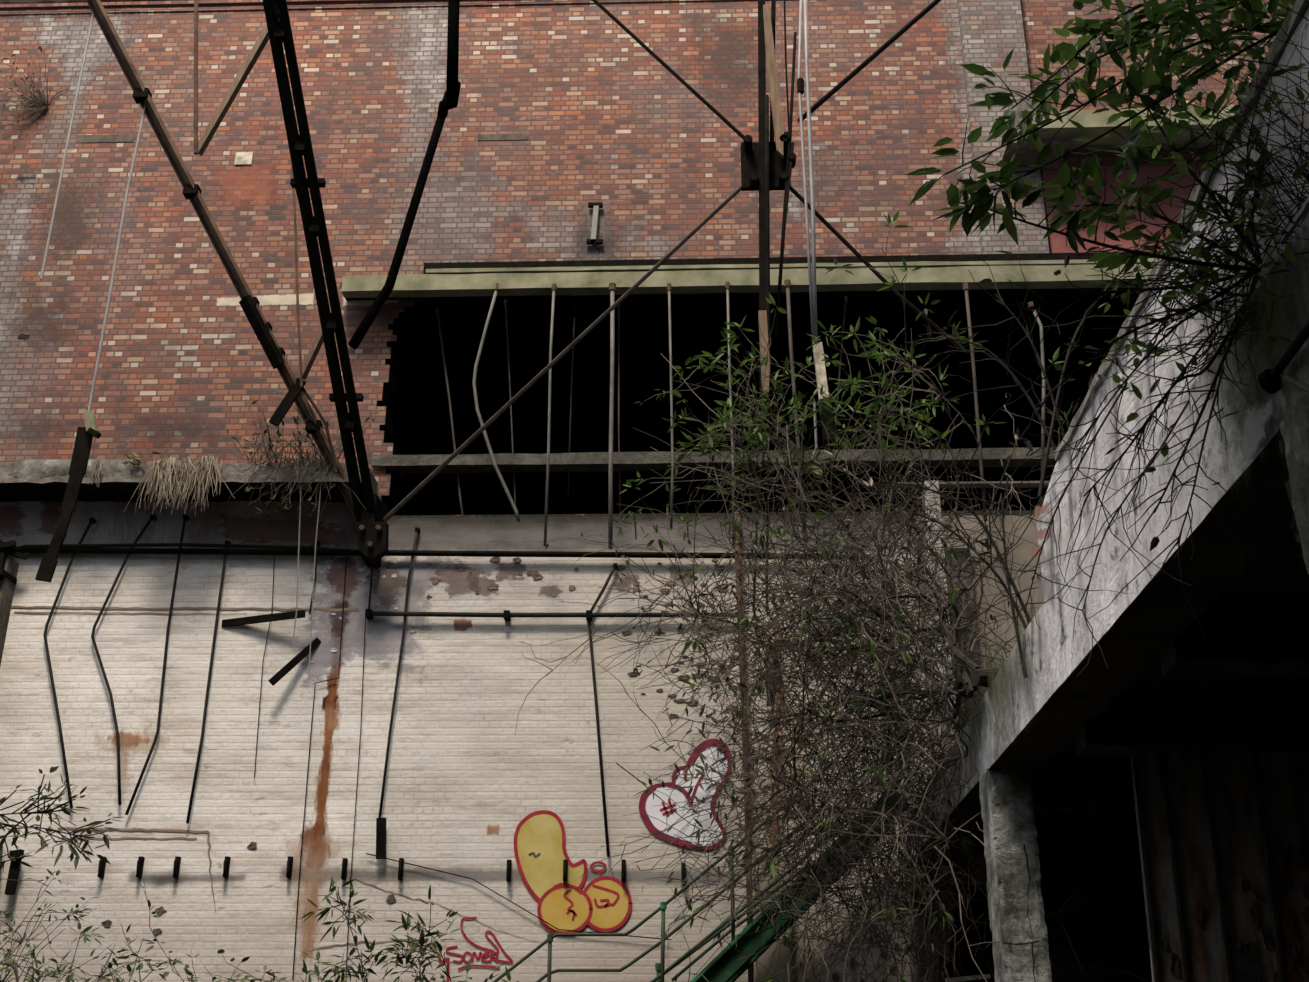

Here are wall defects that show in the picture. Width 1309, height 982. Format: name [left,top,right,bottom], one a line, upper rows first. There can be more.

peeling [218,514,579,686]
peeling [612,560,728,613]
peeling [641,656,737,718]
corrosion [108,731,149,746]
corrosion [300,599,350,959]